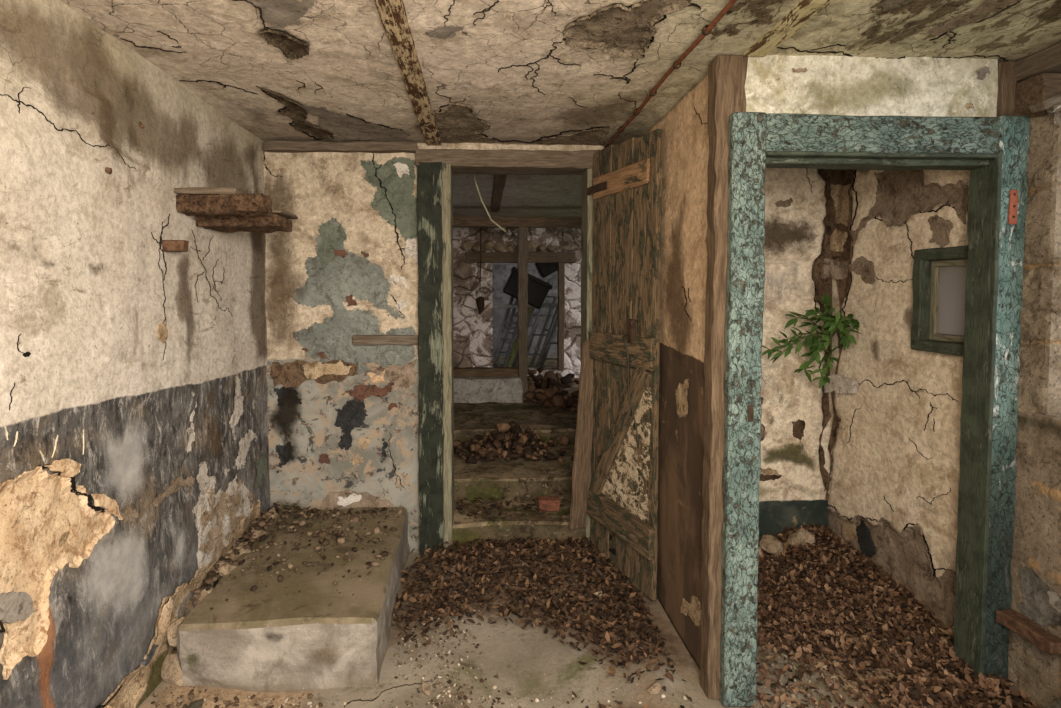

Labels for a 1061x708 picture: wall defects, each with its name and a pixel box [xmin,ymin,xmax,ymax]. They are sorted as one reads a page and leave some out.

peeling [233,0,315,60]
crack [498,42,640,109]
spalling [563,0,701,58]
crack [0,87,136,169]
damp [251,232,293,356]
peeling [270,217,417,466]
damp [272,386,300,460]
flaking render [812,169,969,627]
flaking render [0,459,138,680]
peeling [95,373,292,708]
corrosion [38,608,55,708]